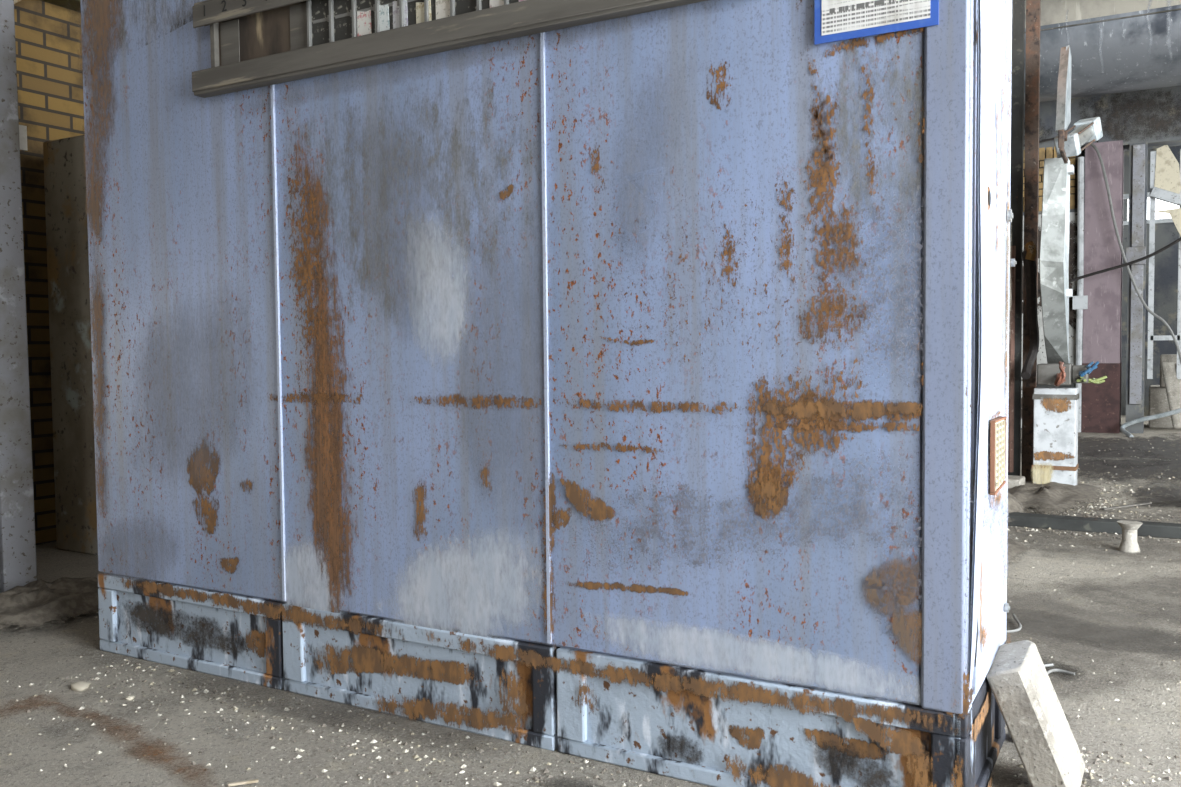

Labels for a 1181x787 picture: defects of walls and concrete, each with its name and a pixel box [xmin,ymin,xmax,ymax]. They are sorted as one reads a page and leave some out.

peeling [1069,221,1077,329]